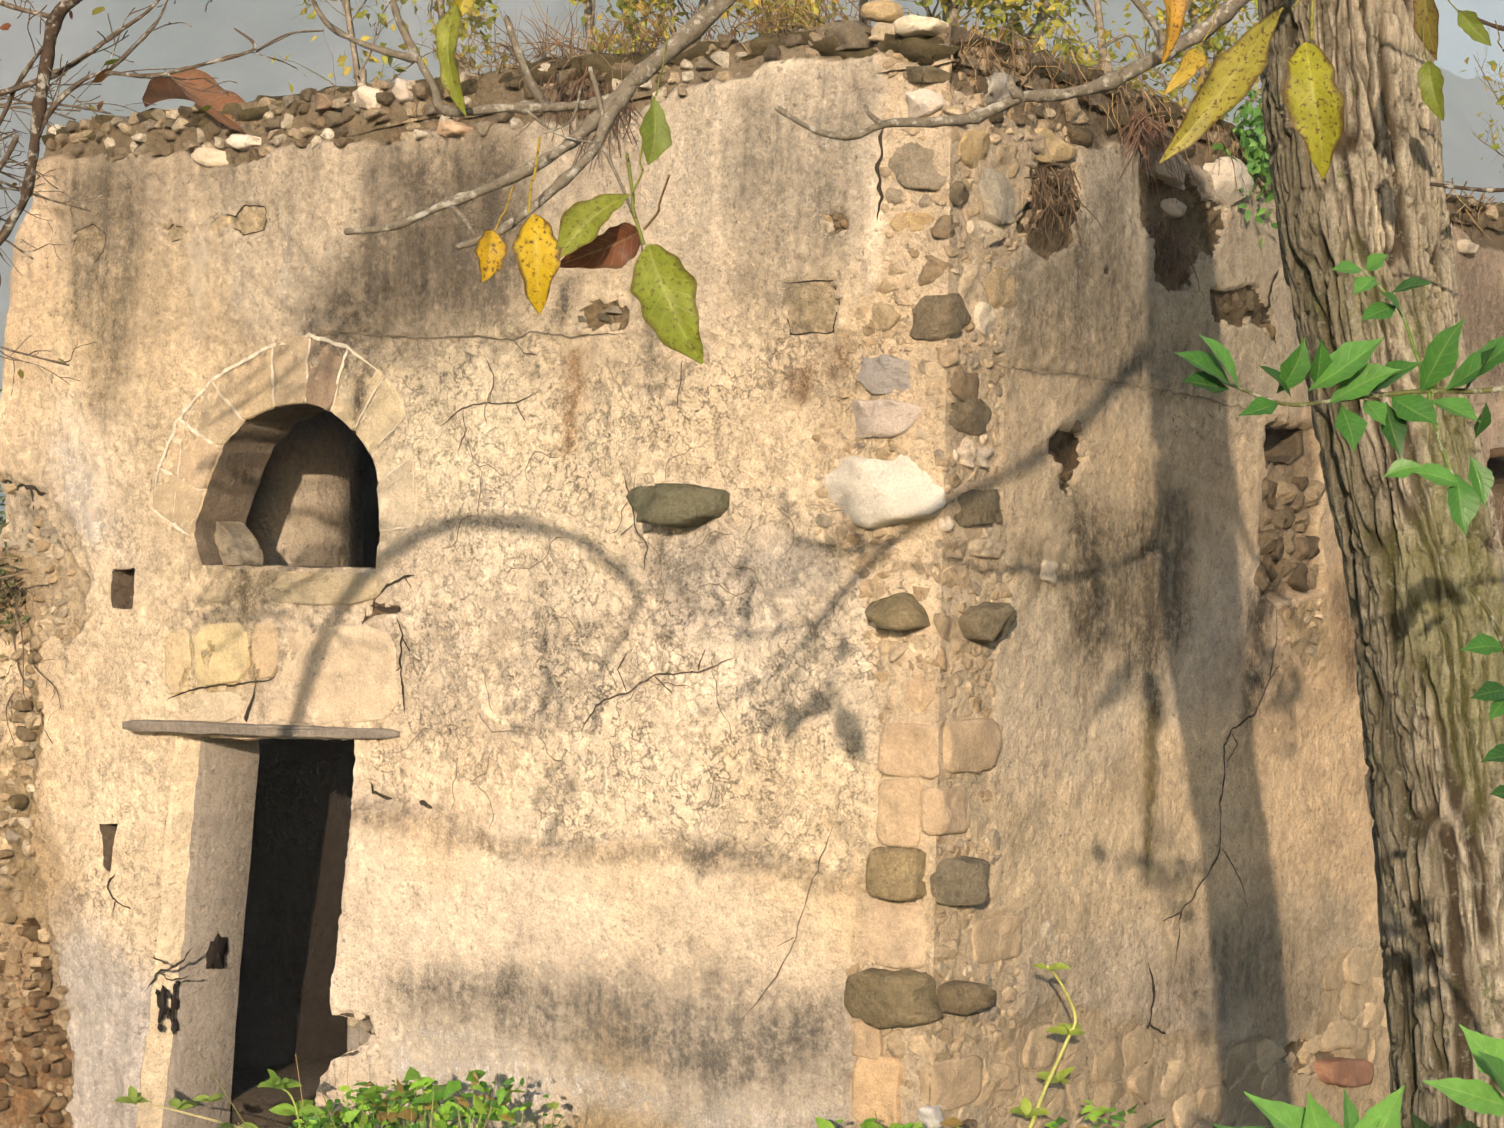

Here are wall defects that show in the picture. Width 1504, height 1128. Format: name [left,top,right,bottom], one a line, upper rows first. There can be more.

water stain [72,171,141,379]
water stain [312,149,528,323]
crack [875,129,884,221]
flaking render [1139,159,1225,291]
flaking render [1209,285,1276,341]
crack [315,331,625,549]
flaking render [1048,420,1089,494]
flaking render [0,474,91,1128]
crack [362,575,733,829]
water stain [1060,492,1194,741]
crack [1145,593,1280,1064]
water stain [397,966,828,1128]